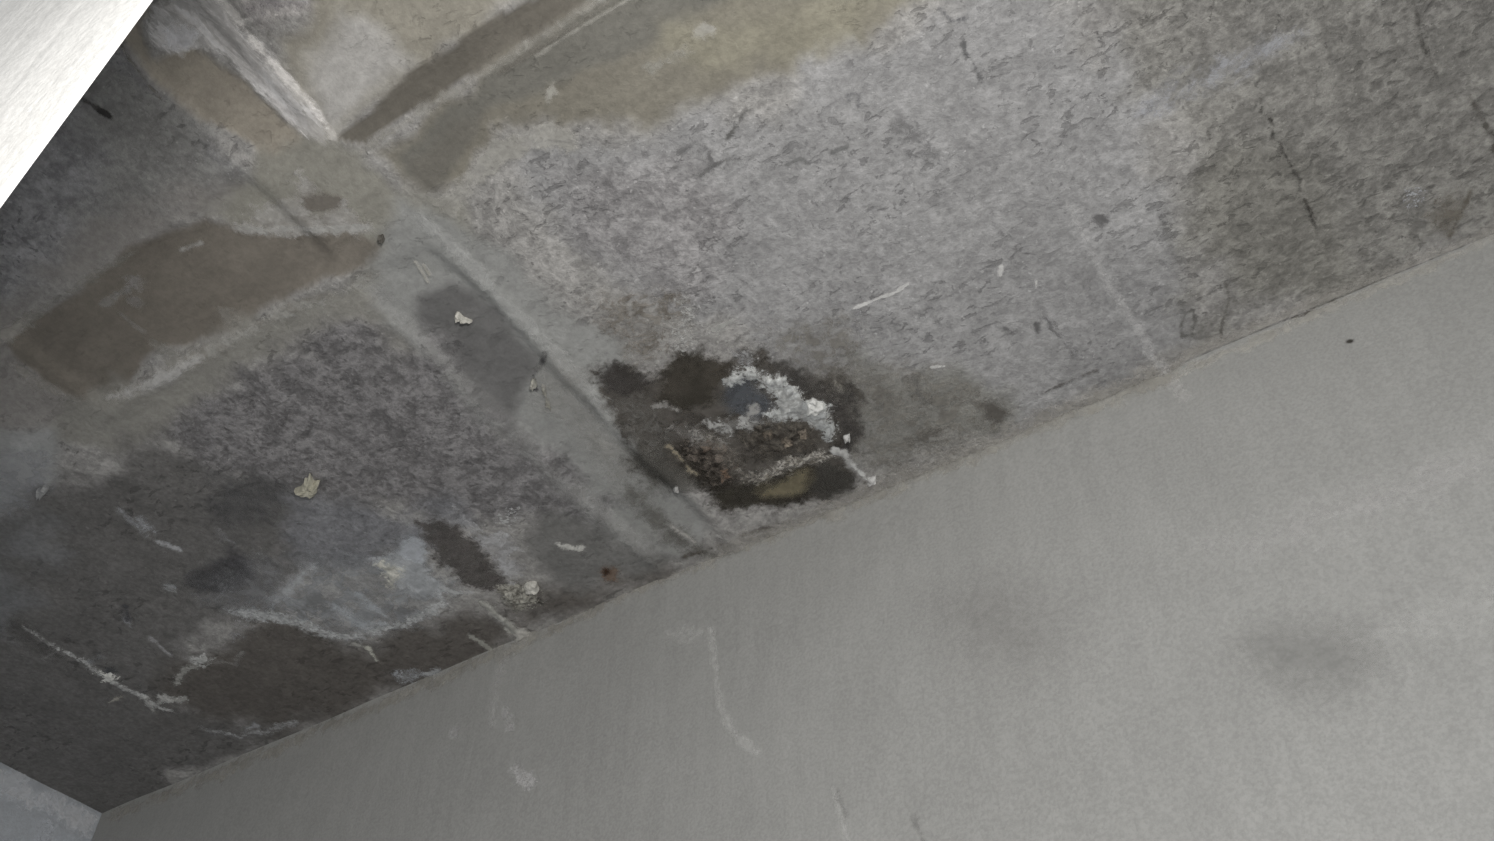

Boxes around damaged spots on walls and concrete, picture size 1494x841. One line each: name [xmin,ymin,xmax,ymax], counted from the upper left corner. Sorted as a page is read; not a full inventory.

crack [81,97,112,119]
spalling [675,420,822,489]
damp [589,292,1008,559]
damp [117,508,182,552]
damp [164,506,529,661]